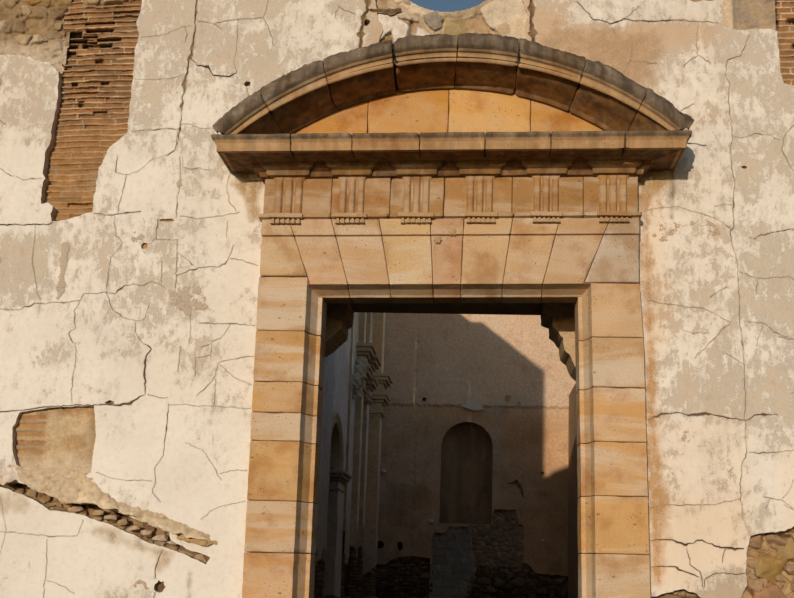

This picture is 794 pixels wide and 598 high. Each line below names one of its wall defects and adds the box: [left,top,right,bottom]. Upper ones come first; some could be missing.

spalling [375,0,527,44]
spalling [691,0,794,86]
spalling [0,0,142,221]
crack [0,0,274,501]
crack [577,3,794,589]
spalling [9,406,96,477]
crack [0,499,84,594]
spalling [0,483,210,563]
spalling [375,556,433,598]
spalling [466,510,568,598]
spalling [651,589,699,598]
spalling [741,527,794,598]